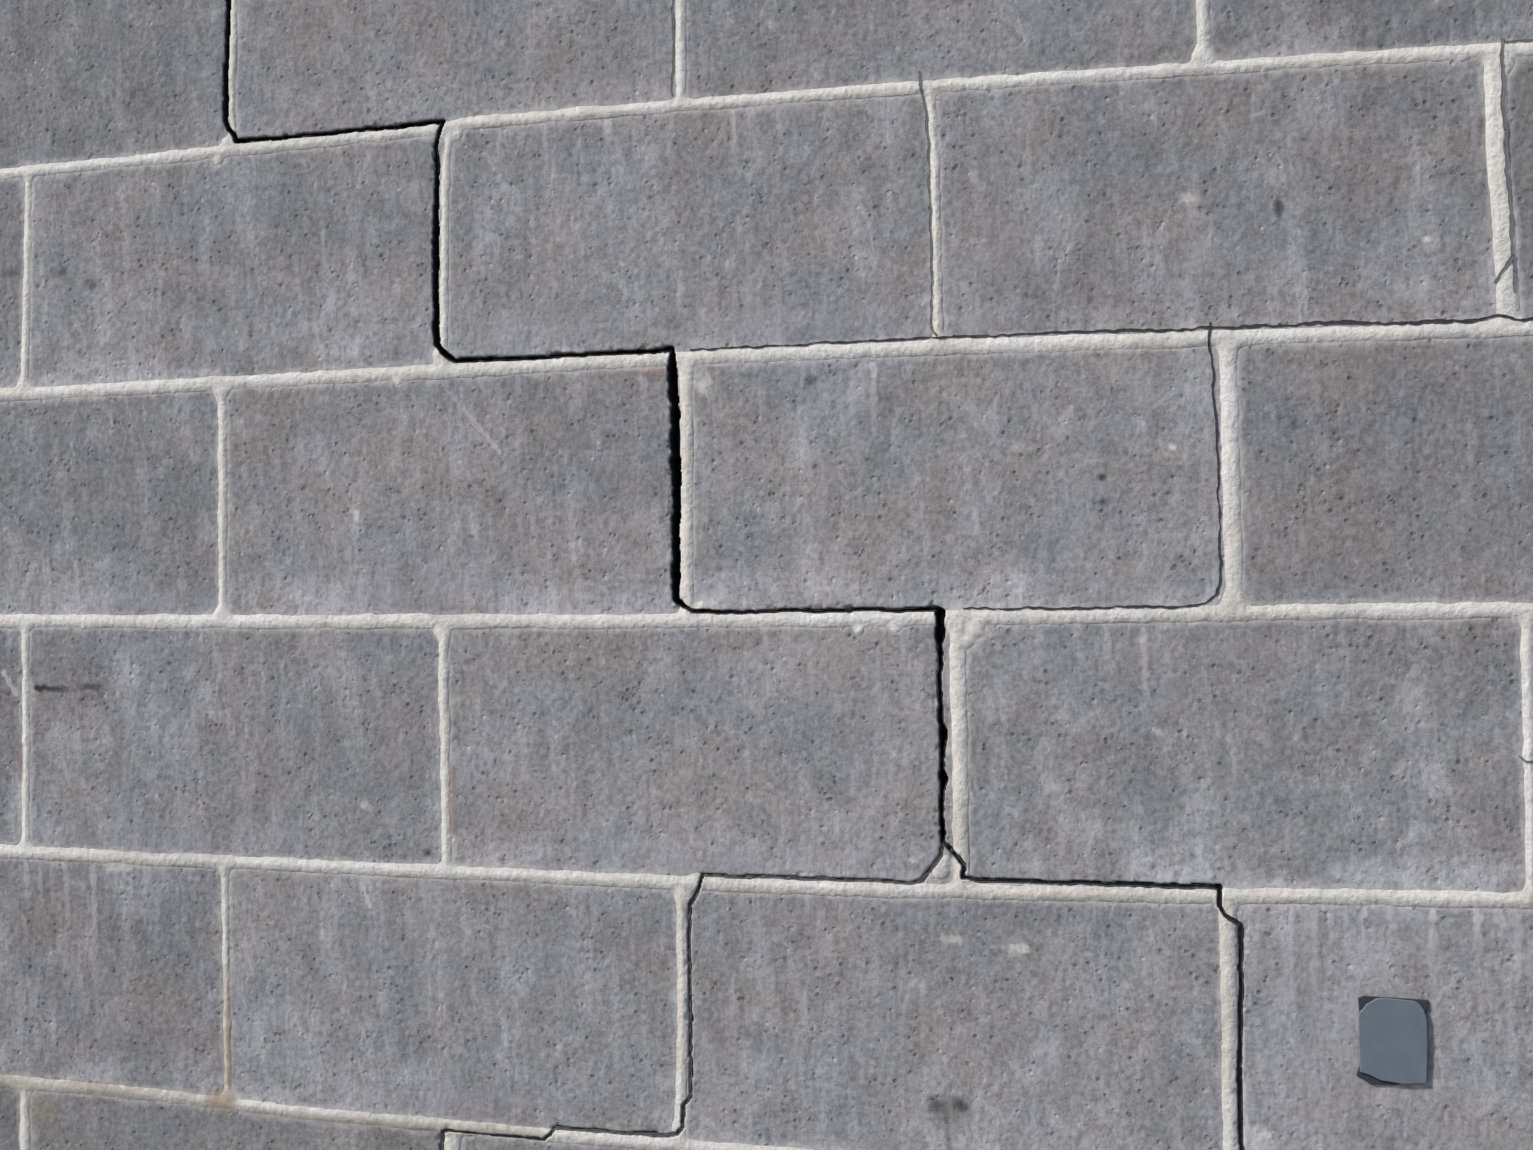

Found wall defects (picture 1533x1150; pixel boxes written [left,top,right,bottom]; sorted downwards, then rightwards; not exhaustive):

crack [223,0,1244,1150]
crack [690,38,1533,611]